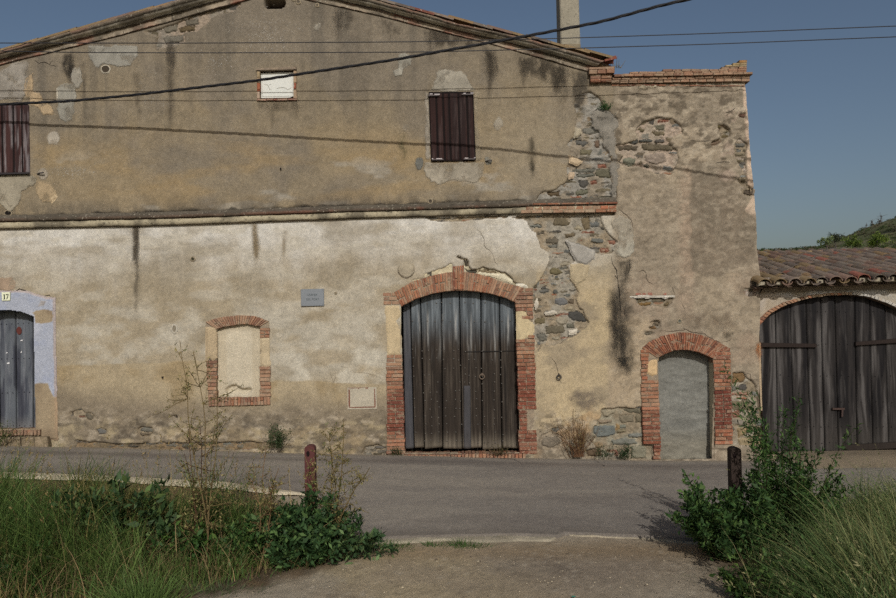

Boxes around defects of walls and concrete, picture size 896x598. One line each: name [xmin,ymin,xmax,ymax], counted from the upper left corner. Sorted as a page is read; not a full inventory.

peeling [23,68,83,122]
peeling [88,45,138,74]
water stain [520,58,564,85]
peeling [36,168,58,203]
peeling [47,131,60,144]
spalling [537,92,682,199]
spalling [711,125,755,196]
spalling [412,213,634,351]
water stain [611,294,631,368]
spalling [586,407,652,459]